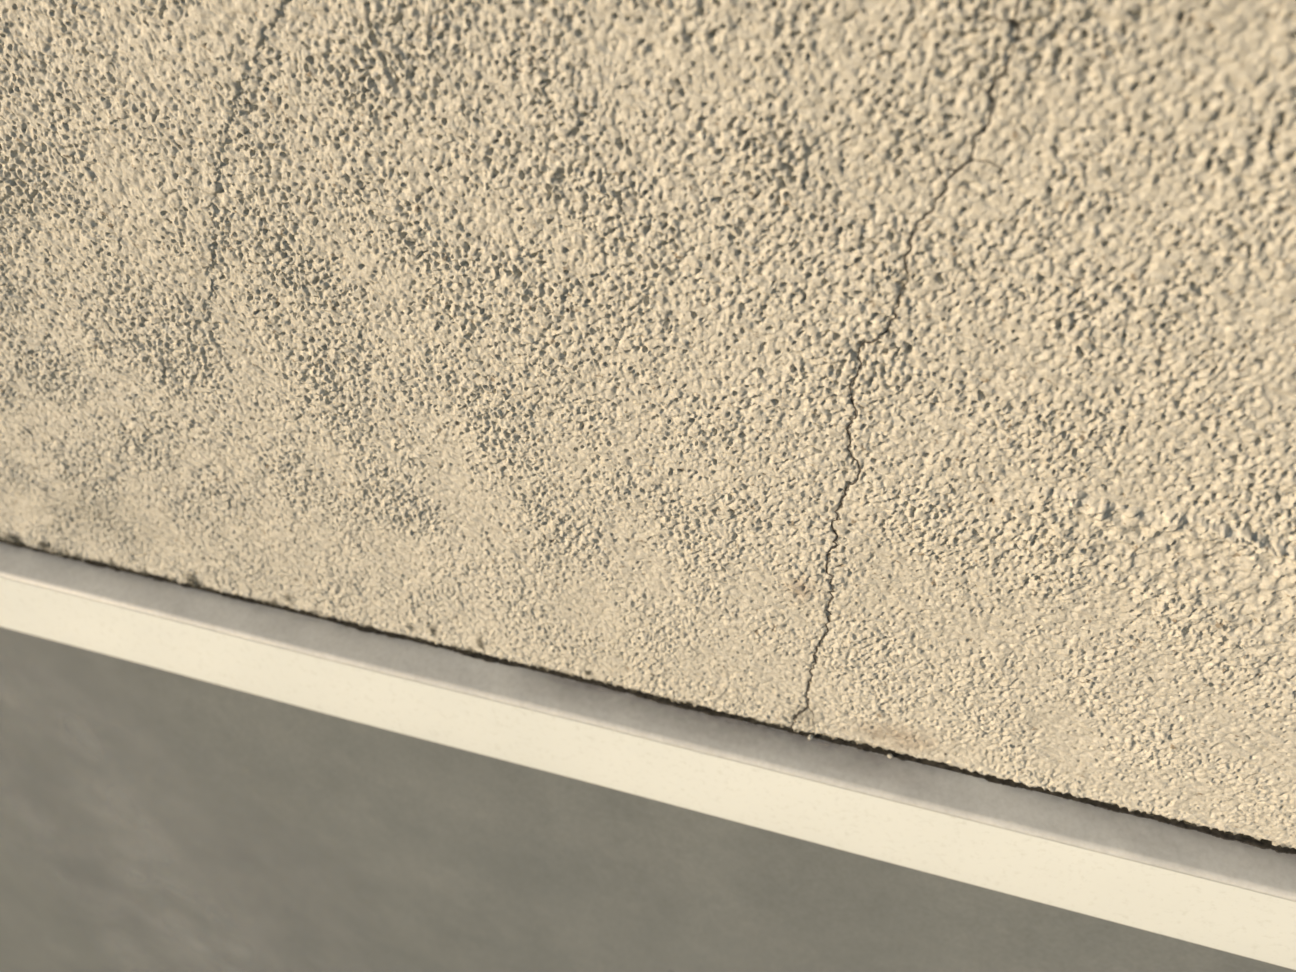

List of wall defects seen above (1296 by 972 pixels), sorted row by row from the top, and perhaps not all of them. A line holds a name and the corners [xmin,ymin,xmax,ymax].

crack [790,0,1021,728]